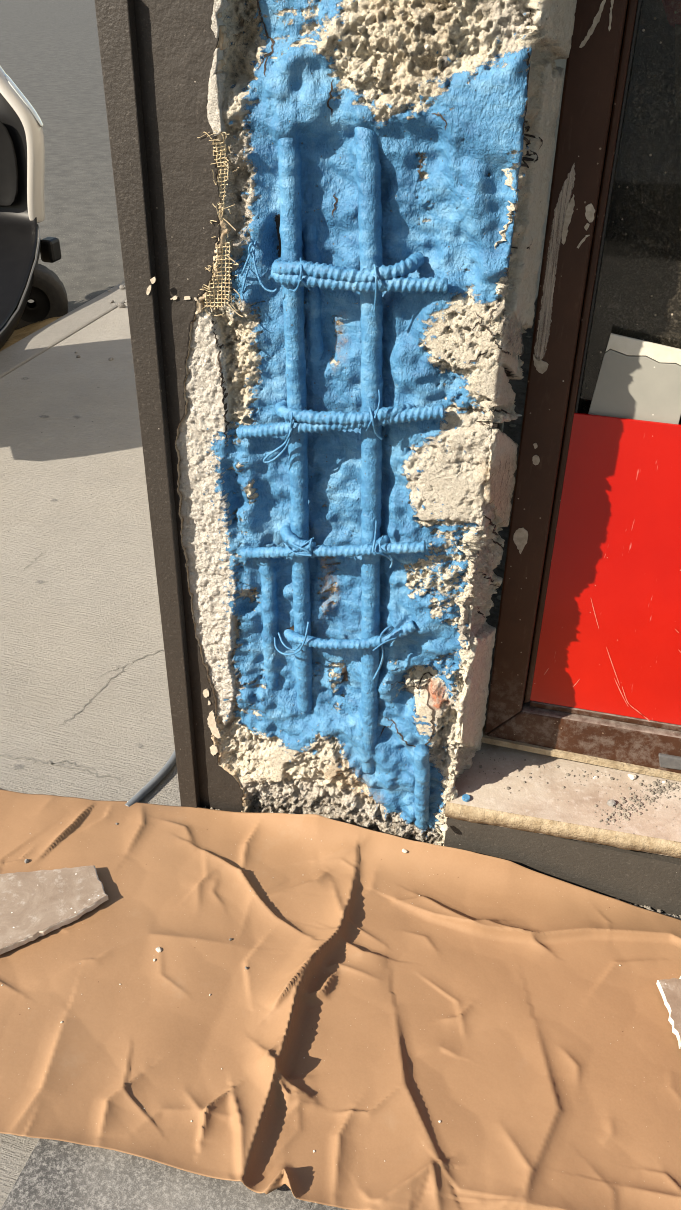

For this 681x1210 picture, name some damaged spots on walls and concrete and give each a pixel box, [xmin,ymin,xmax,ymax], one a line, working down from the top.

spalling [176,0,561,846]
crack [380,672,435,747]